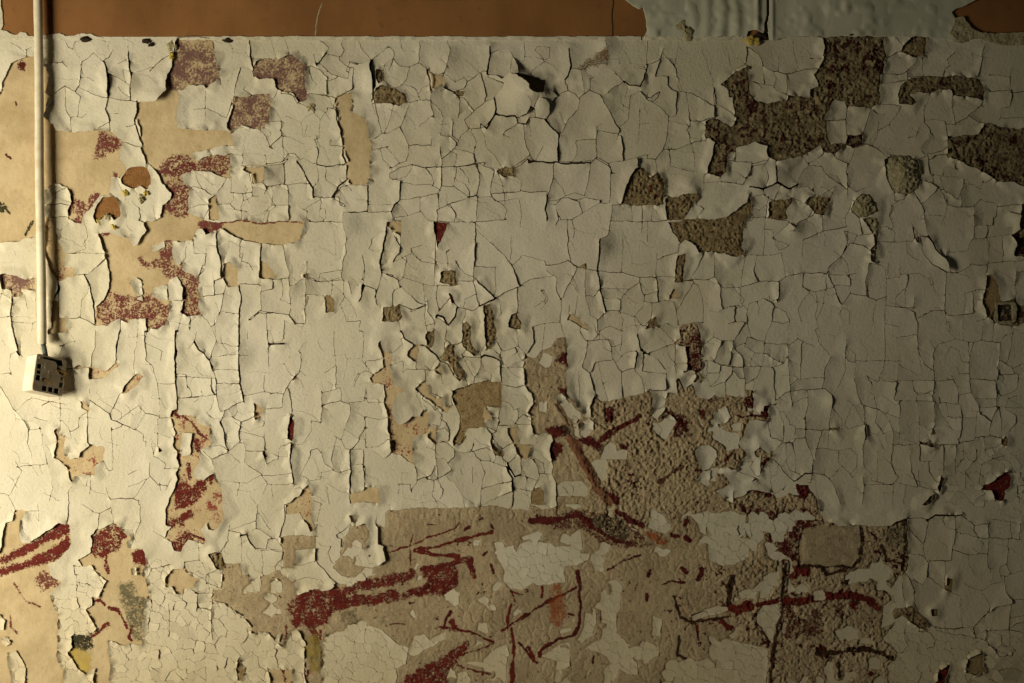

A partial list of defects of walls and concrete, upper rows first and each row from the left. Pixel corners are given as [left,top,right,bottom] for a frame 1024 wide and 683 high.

crack [52,41,163,147]
peeling [658,37,825,127]
flaking render [704,37,889,177]
peeling [846,36,1024,186]
crack [60,229,98,363]
crack [85,0,1024,573]
flaking render [665,193,752,257]
peeling [832,145,1024,342]
crack [1,293,91,521]
peeling [0,414,224,683]
crack [672,567,735,660]
crack [814,514,1024,678]